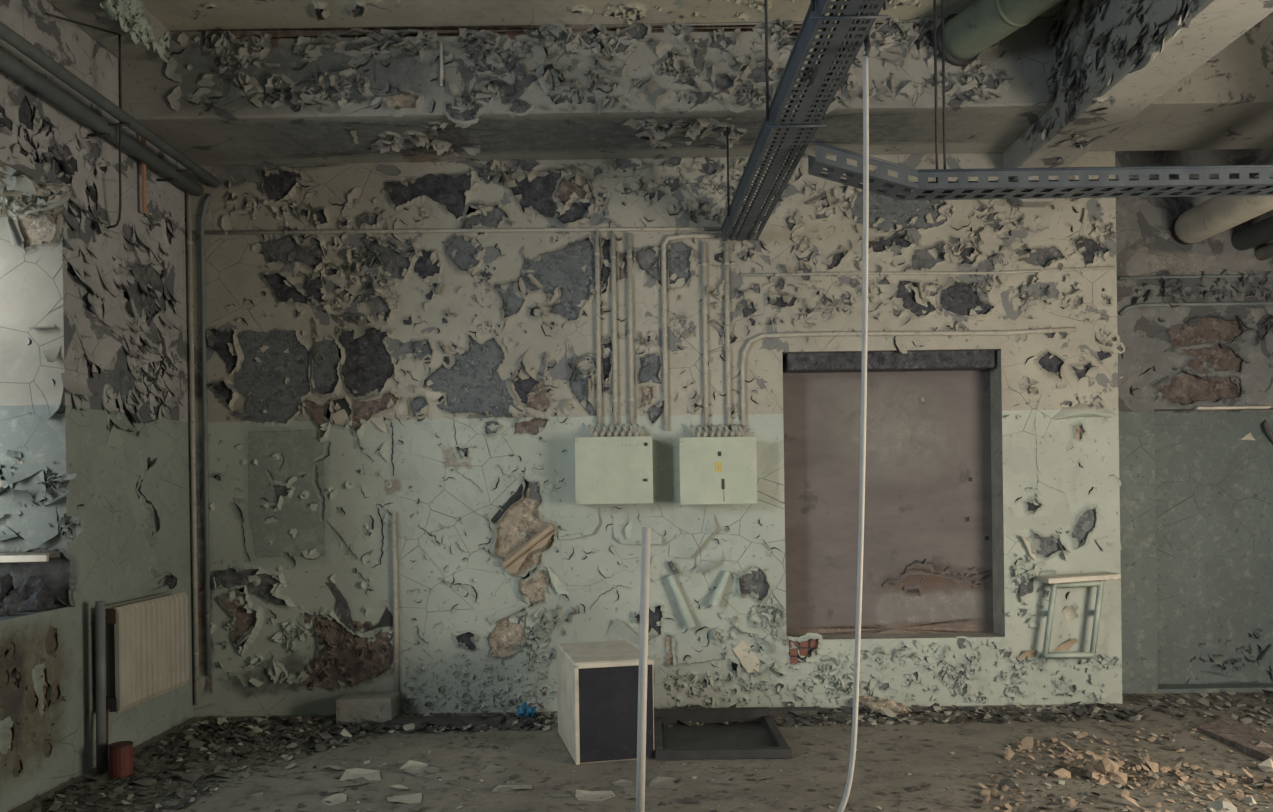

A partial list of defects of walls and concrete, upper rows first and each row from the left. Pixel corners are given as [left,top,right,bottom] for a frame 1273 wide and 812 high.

peeling [98,0,173,64]
peeling [1017,0,1195,165]
crack [221,176,502,336]
peeling [194,0,1125,490]
crack [577,192,863,417]
crack [868,298,939,355]
crack [936,199,1111,276]
flaking render [211,475,573,713]
crack [209,299,786,676]
peeling [630,563,1123,708]
peeling [1005,494,1099,628]